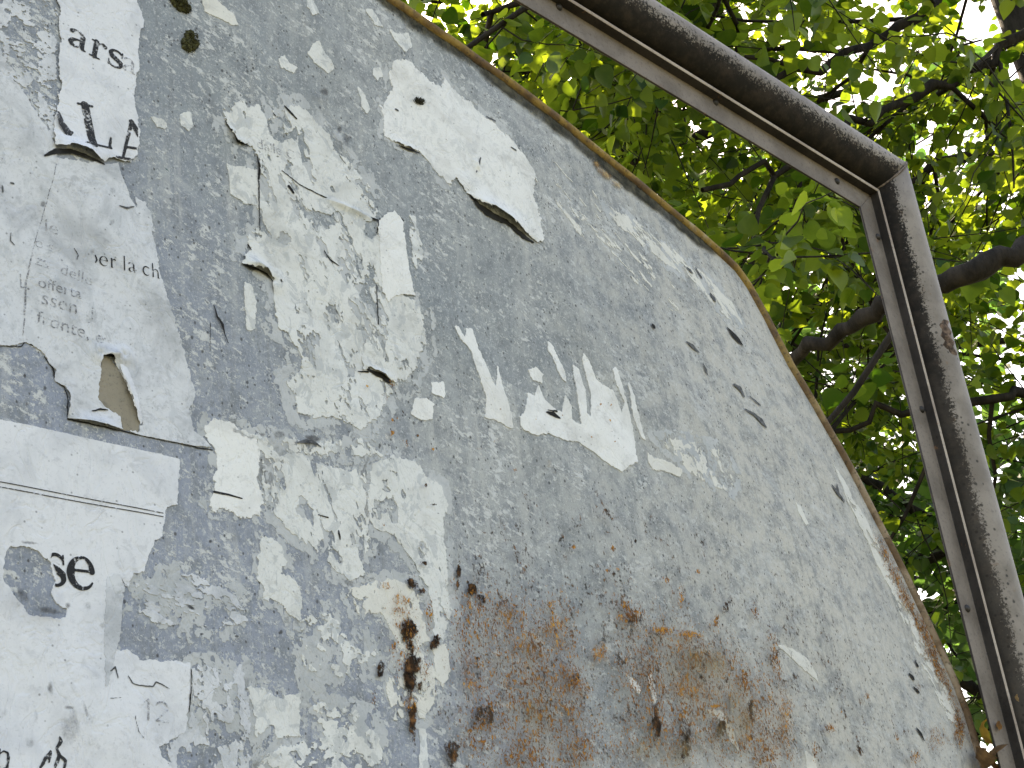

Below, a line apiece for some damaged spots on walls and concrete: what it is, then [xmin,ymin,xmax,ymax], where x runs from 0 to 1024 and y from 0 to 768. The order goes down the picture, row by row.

corrosion [377,493,883,768]
corrosion [872,532,968,764]